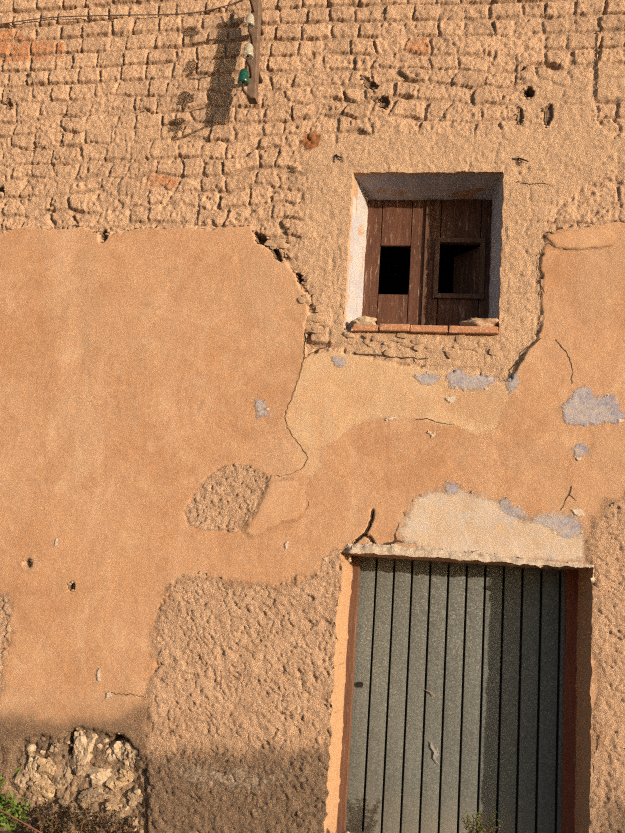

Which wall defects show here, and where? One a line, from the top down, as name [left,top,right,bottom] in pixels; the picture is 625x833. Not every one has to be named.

spalling [361,74,389,110]
spalling [37,223,109,242]
spalling [264,237,326,334]
crack [512,249,573,383]
crack [353,352,428,364]
spalling [342,331,499,403]
crack [267,329,327,483]
peeling [562,386,625,427]
spalling [184,463,268,532]
crack [352,510,405,545]
spalling [0,481,625,833]